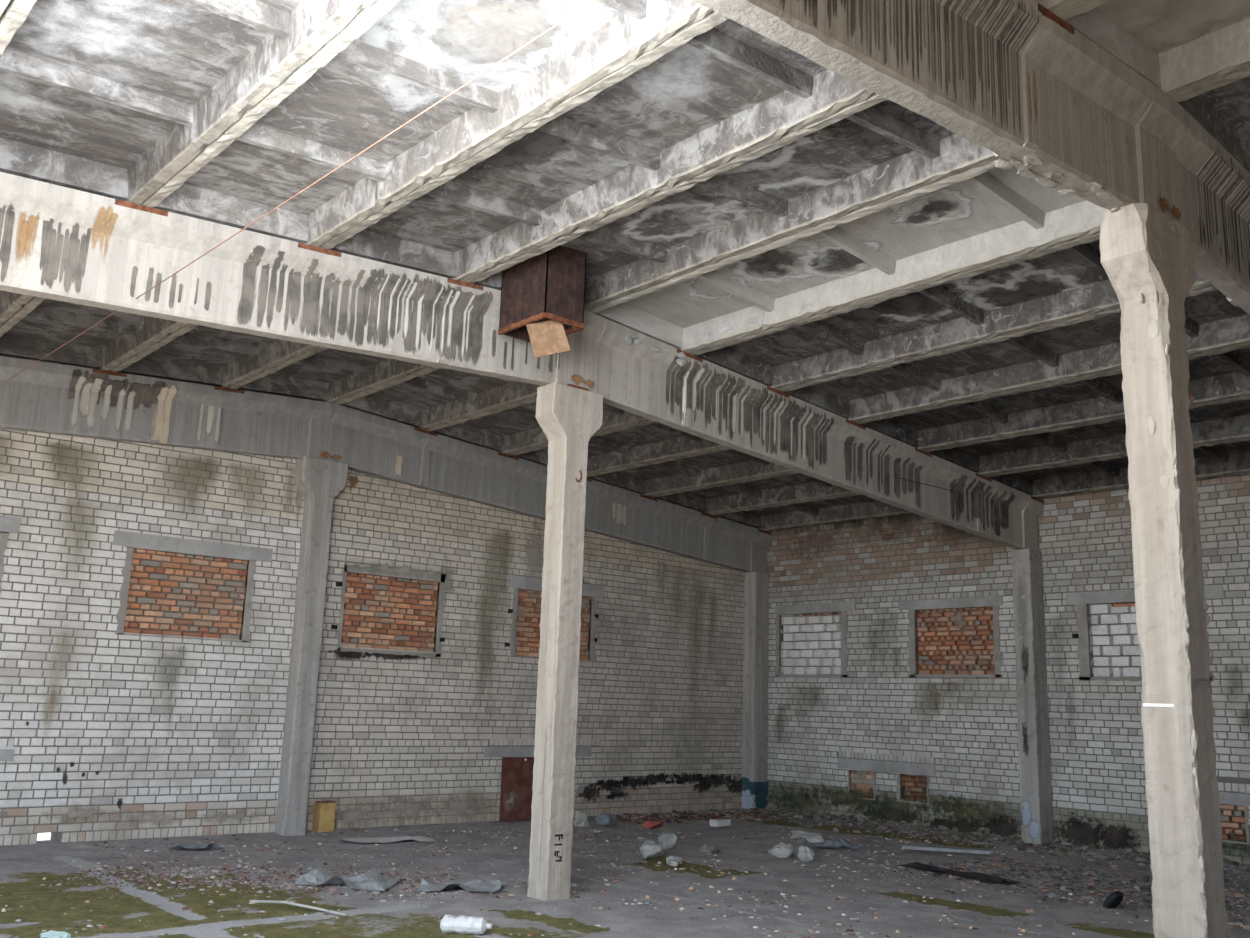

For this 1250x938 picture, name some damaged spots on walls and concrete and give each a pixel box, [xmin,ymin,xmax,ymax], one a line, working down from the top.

leakage [356,0,613,93]
leakage [364,67,453,111]
leakage [718,137,814,175]
leakage [758,176,840,191]
leakage [621,200,764,241]
leakage [889,189,972,227]
leakage [679,240,875,299]
leakage [841,262,1087,330]